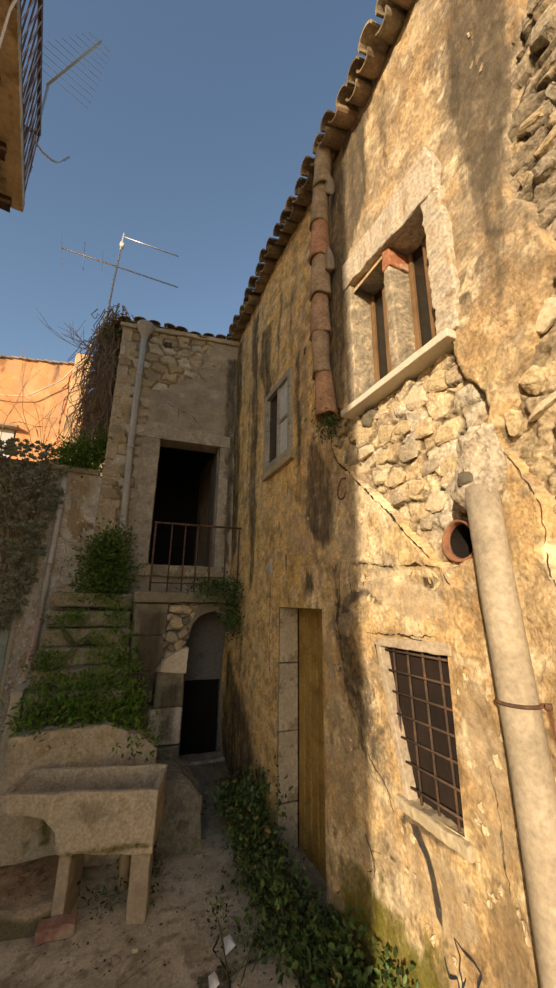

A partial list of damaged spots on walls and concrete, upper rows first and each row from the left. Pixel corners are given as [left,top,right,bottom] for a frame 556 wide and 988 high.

water stain [449,0,513,244]
spalling [504,0,556,241]
crack [329,436,450,678]
spalling [335,348,490,619]
spalling [501,273,556,515]
crack [503,451,556,585]
peeling [474,802,499,846]
peeling [467,734,510,789]